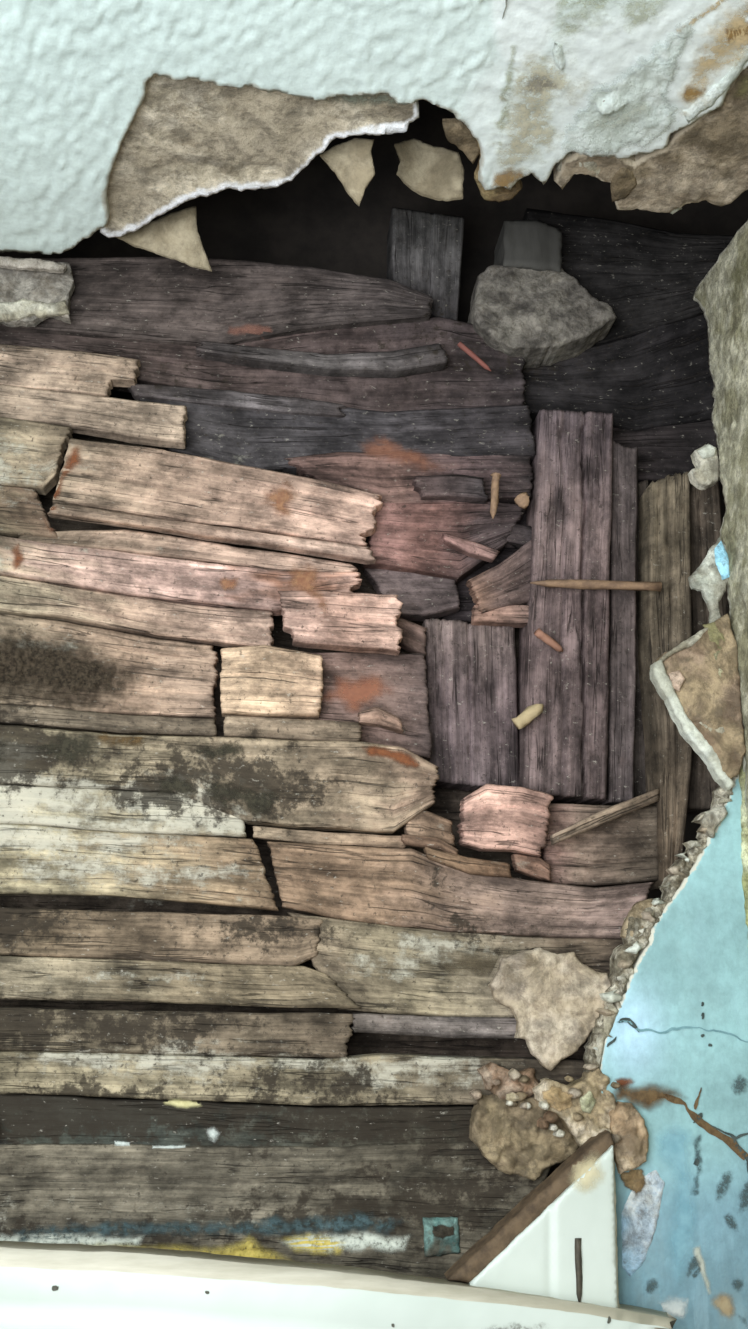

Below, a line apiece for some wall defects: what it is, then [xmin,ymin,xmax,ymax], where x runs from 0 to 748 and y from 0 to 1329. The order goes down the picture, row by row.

water stain [494,63,567,187]
spalling [0,24,748,323]
spalling [110,390,135,400]
peeling [697,444,717,459]
water stain [0,634,129,706]
water stain [196,745,242,758]
spalling [488,538,748,1113]
crack [607,1018,748,1047]
water stain [693,1136,702,1195]
peeling [433,1225,454,1239]
peeling [620,1169,665,1277]
water stain [717,1175,748,1229]